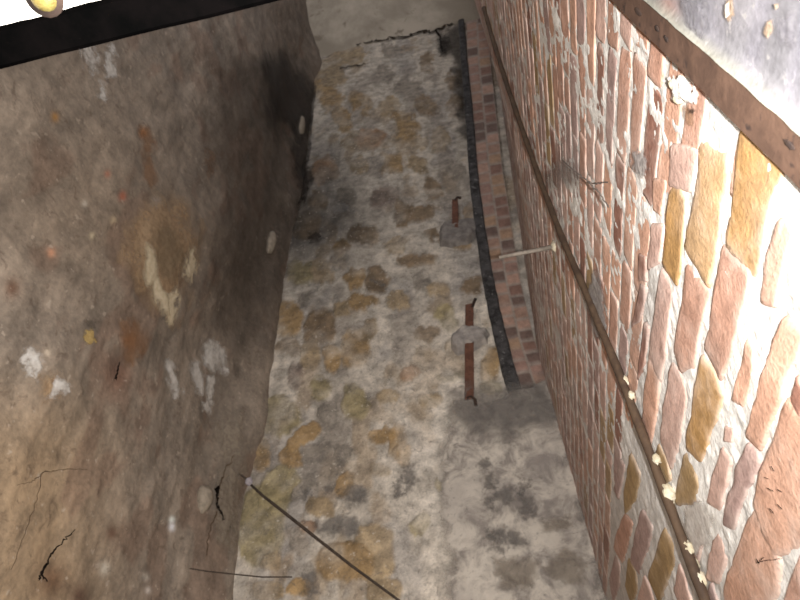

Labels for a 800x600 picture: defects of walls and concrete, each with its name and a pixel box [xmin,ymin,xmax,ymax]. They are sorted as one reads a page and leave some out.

crack [340,23,453,69]
efflorescence [21,347,41,373]
efflorescence [45,378,70,396]
efflorescence [166,361,185,399]
efflorescence [192,341,228,412]
crack [11,469,88,569]
crack [206,454,236,555]
crack [38,529,76,582]